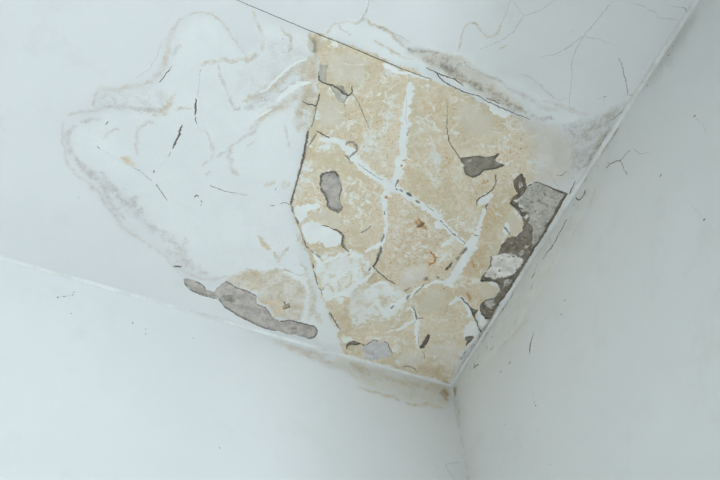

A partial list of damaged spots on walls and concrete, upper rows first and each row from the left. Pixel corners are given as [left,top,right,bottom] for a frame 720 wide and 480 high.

crack [97,75,200,198]
damp [61,10,504,415]
crack [271,75,478,371]
crack [237,0,528,158]
peeling [289,33,577,382]
damp [322,16,627,179]
crack [470,174,497,209]
spalling [184,278,318,339]
crack [460,297,482,333]